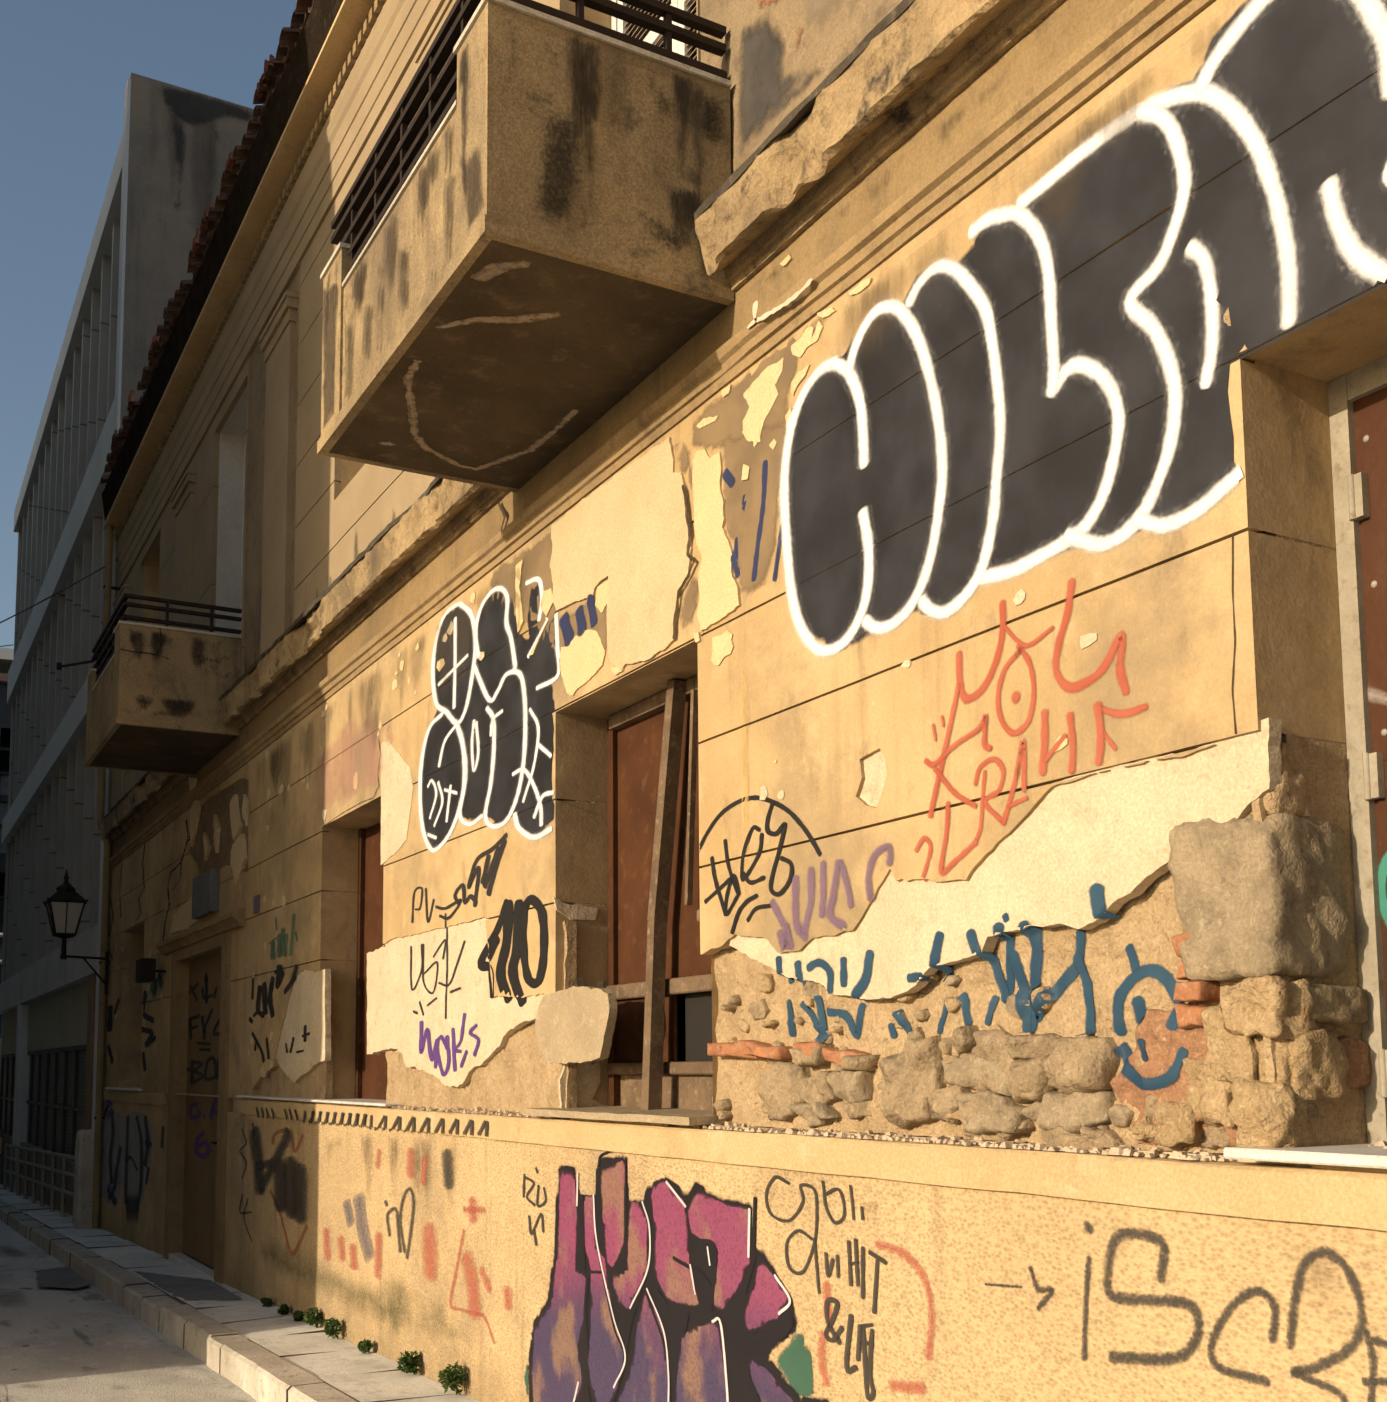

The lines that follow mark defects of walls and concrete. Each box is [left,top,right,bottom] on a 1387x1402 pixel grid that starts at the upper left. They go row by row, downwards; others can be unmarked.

leakage [163,88,251,176]
leakage [417,54,481,249]
leakage [651,80,722,248]
leakage [323,215,405,426]
leakage [437,313,559,328]
spalling [747,278,812,328]
leakage [405,360,579,470]
flaking render [470,307,836,696]
flaking render [188,777,250,884]
spalling [248,969,334,1099]
spalling [366,897,617,1113]
spalling [707,717,1371,1153]